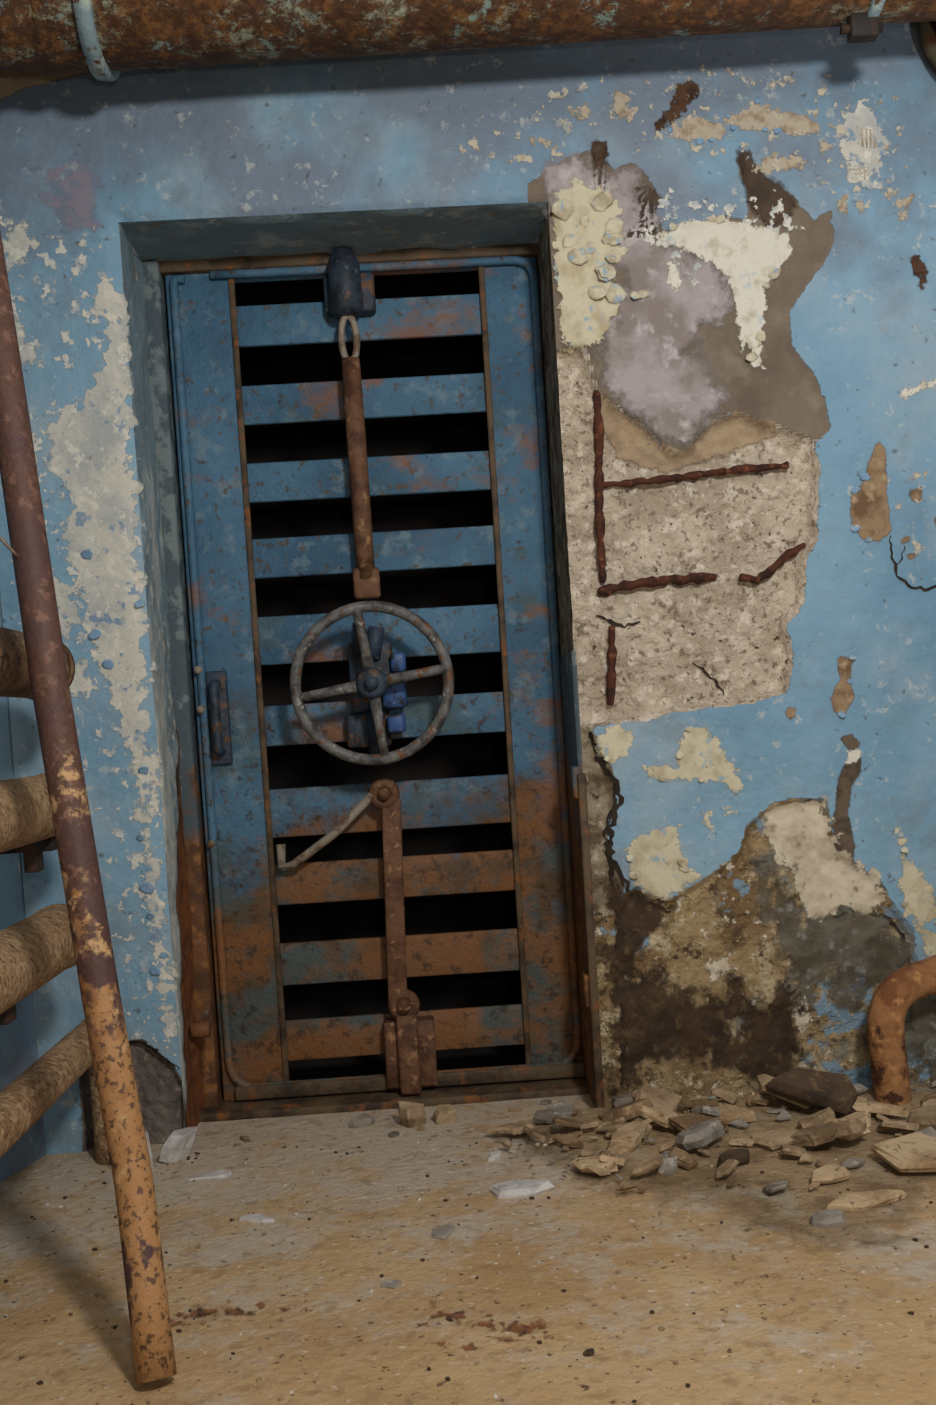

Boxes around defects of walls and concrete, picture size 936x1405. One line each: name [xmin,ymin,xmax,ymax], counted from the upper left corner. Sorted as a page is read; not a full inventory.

peeling [0,216,188,1152]
spalling [460,60,936,1107]
crack [889,536,936,592]
water stain [601,857,912,1096]
water stain [905,998,936,1082]